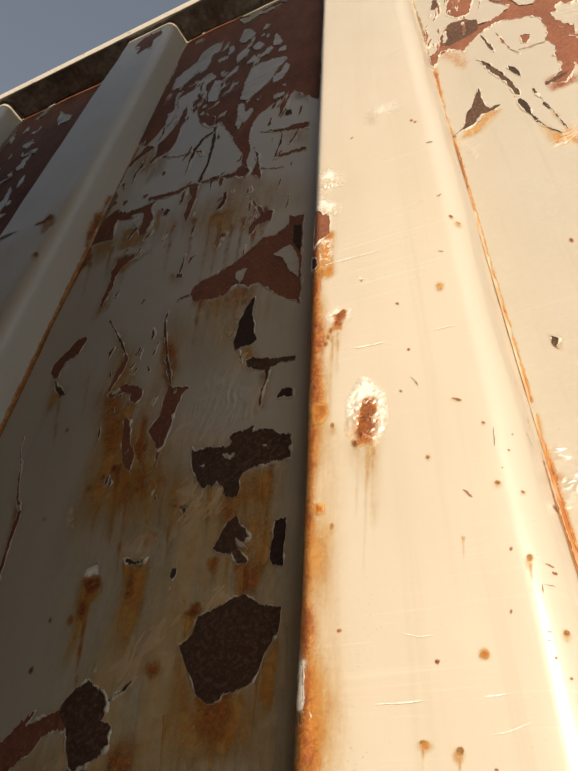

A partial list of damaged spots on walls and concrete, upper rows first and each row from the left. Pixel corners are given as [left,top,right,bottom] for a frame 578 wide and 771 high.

peeling [0,81,103,235]
rust [0,191,118,436]
peeling [97,311,190,504]
peeling [90,0,334,407]
peeling [453,87,501,138]
rust [450,128,533,402]
peeling [424,0,578,90]
rust [294,250,389,771]
rust [542,450,578,575]
rust [67,576,101,664]
rust [82,463,287,771]